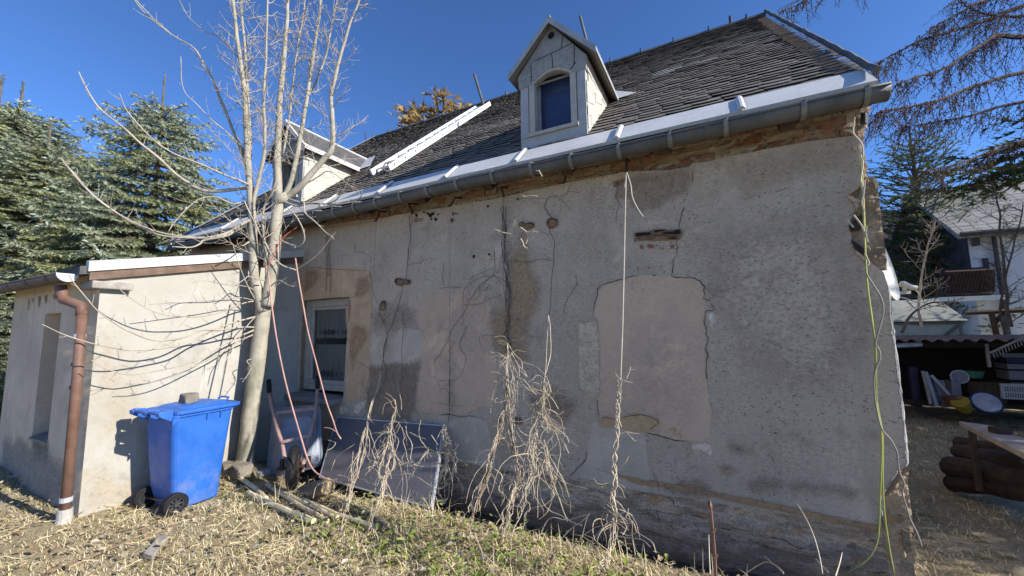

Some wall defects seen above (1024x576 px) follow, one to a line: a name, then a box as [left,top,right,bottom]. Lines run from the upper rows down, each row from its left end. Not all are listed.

crack [563,172,714,380]
spalling [634,229,682,249]
spalling [846,176,887,271]
damp [614,474,881,531]